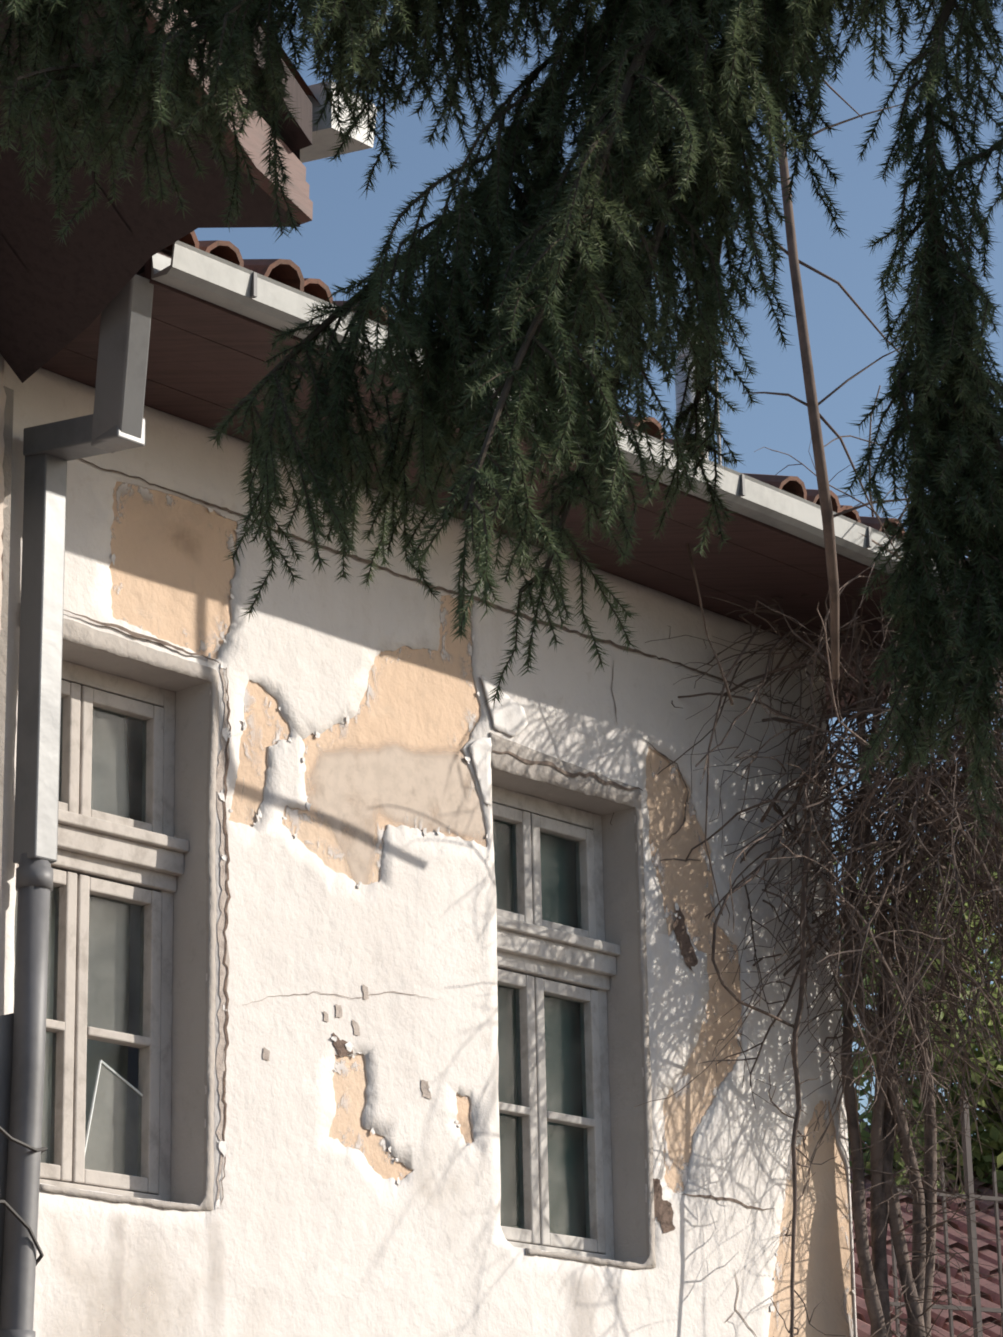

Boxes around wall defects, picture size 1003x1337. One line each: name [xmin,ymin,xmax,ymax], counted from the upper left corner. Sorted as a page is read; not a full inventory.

crack [63,458,804,721]
peeling [109,482,528,1210]
crack [493,750,643,791]
crack [648,742,700,863]
crack [245,991,438,1005]
peeling [645,747,746,1233]
crack [682,1194,775,1211]
peeling [768,1098,855,1337]